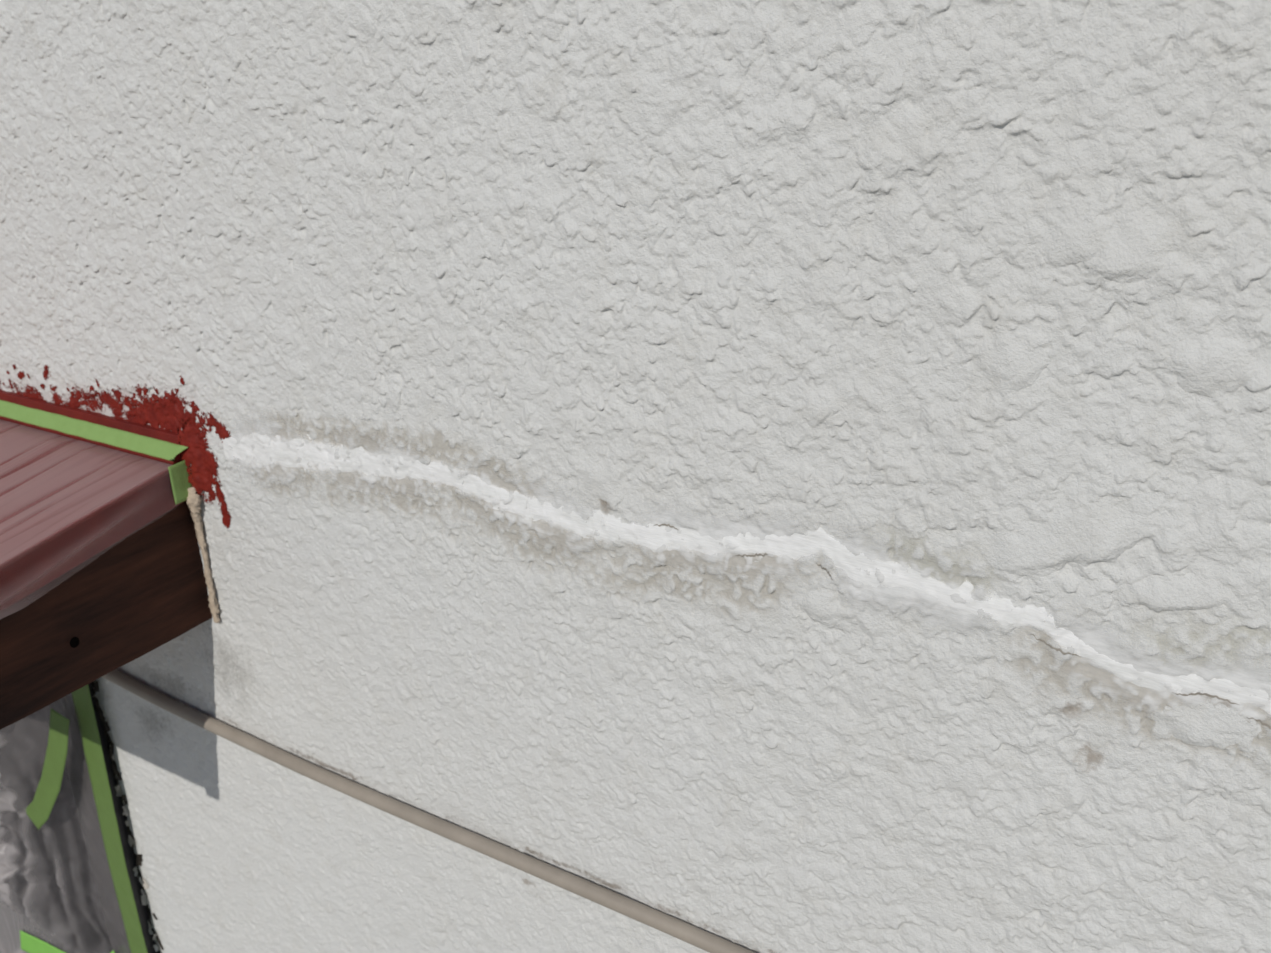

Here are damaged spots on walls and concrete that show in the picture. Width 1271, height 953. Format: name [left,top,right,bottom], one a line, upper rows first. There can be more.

crack [222,420,1271,729]